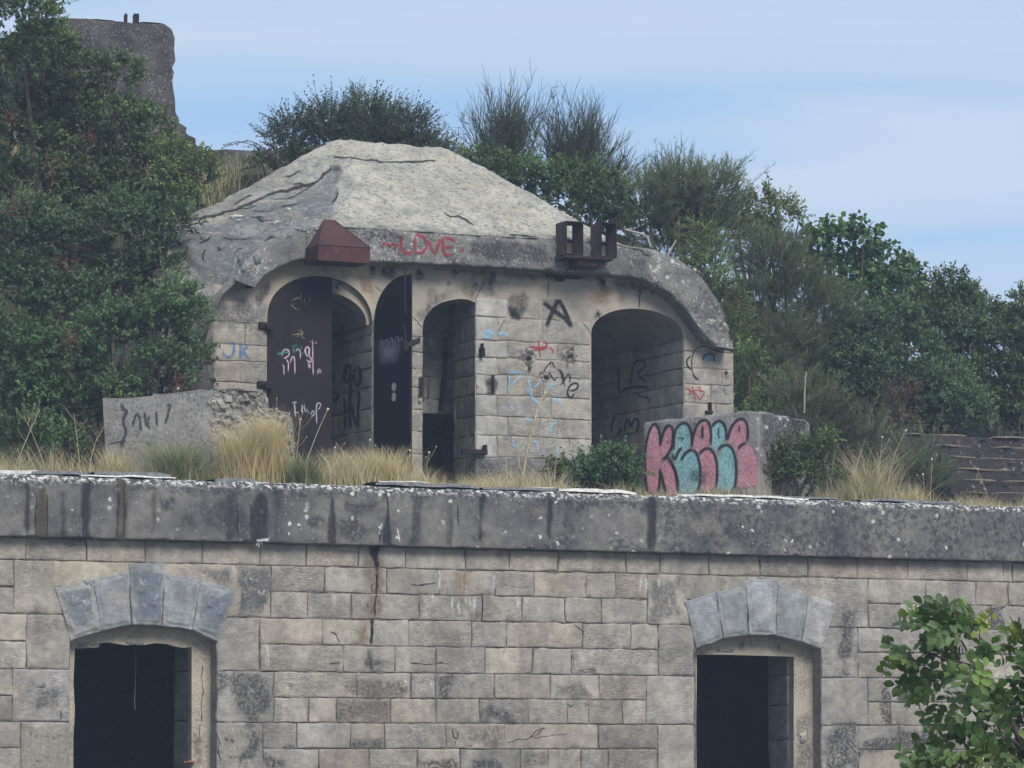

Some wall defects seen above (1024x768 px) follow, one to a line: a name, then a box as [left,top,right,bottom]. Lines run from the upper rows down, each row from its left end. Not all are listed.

crack [172,156,435,224]
damp [227,491,277,547]
damp [215,674,291,768]